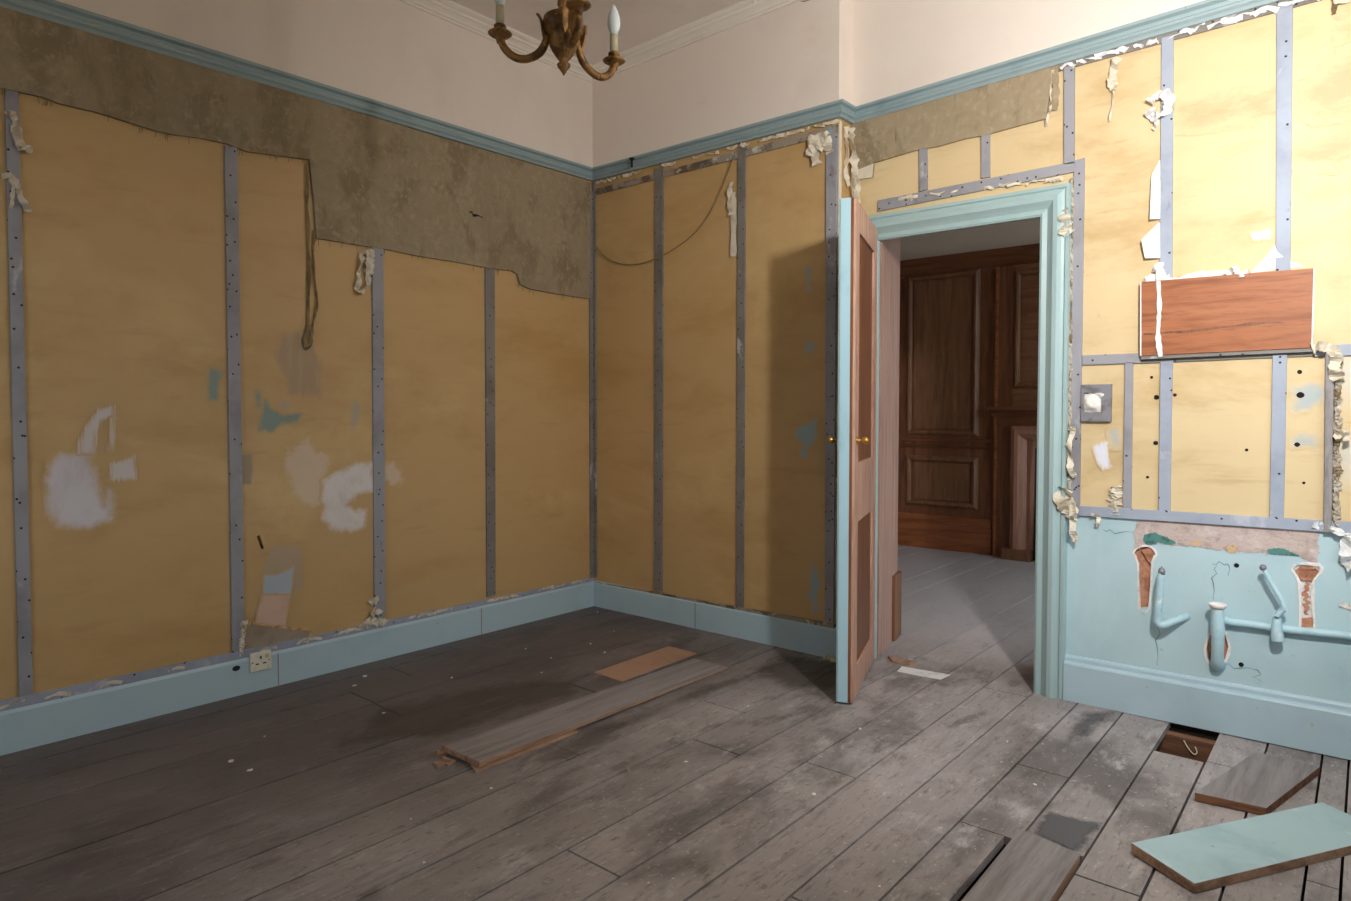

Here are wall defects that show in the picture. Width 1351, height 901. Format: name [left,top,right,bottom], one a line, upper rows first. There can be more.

flaking render [1134,520,1320,618]